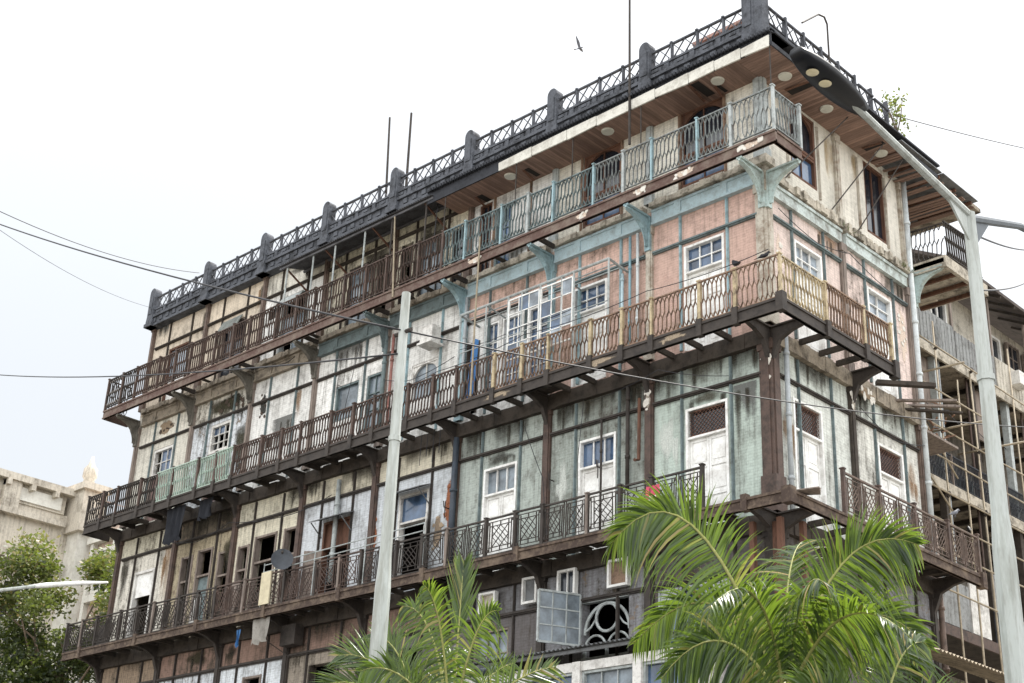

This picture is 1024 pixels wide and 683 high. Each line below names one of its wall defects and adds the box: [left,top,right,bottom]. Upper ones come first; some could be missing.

peeling [737,136,763,152]
damp [211,397,244,419]
spalling [431,481,451,551]